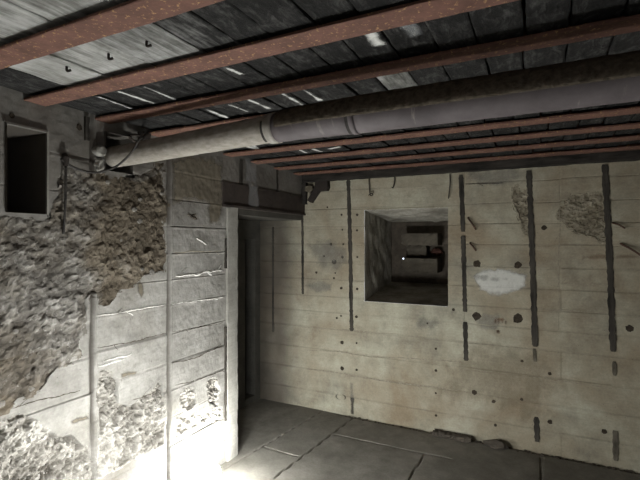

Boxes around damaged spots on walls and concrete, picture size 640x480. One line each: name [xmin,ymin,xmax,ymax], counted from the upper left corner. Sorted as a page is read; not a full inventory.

spalling [511,183,528,235]
spalling [556,191,606,244]
spalling [0,157,224,480]